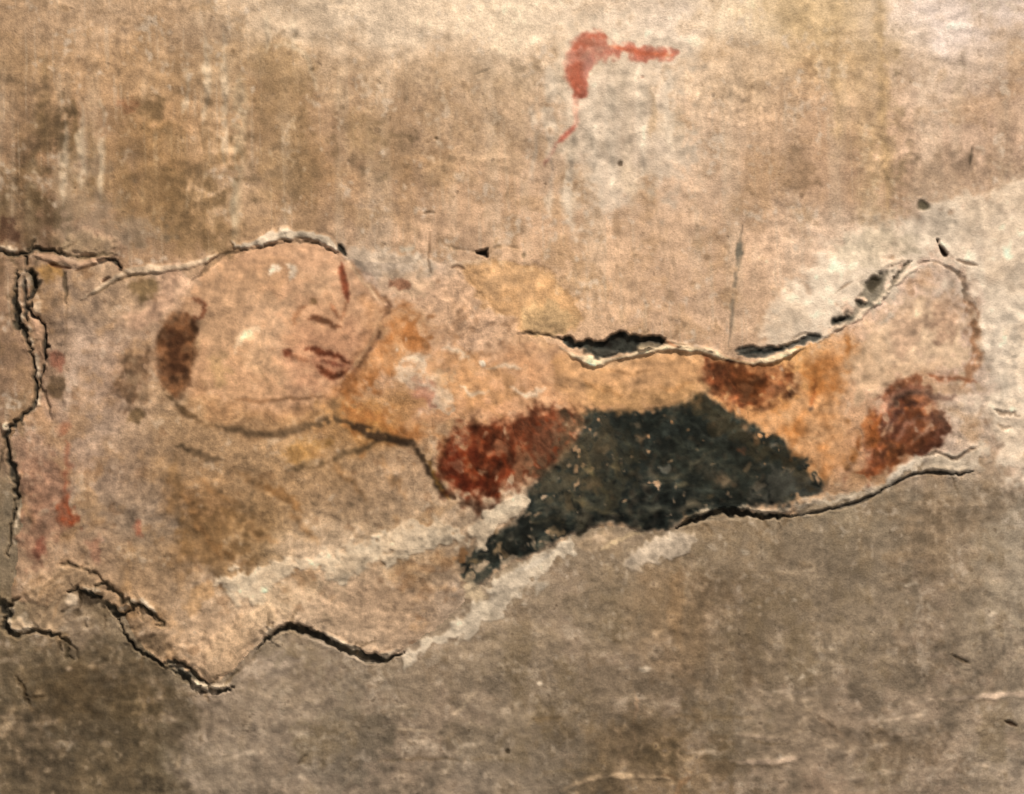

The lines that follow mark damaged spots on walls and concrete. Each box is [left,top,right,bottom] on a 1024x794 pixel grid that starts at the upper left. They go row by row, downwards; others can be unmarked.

crack [188,238,339,287]
crack [917,257,979,327]
crack [516,329,567,342]
crack [660,339,688,347]
crack [790,332,815,342]
crack [0,237,138,558]
crack [675,407,1023,537]
crack [0,560,406,707]
water stain [0,552,1019,794]